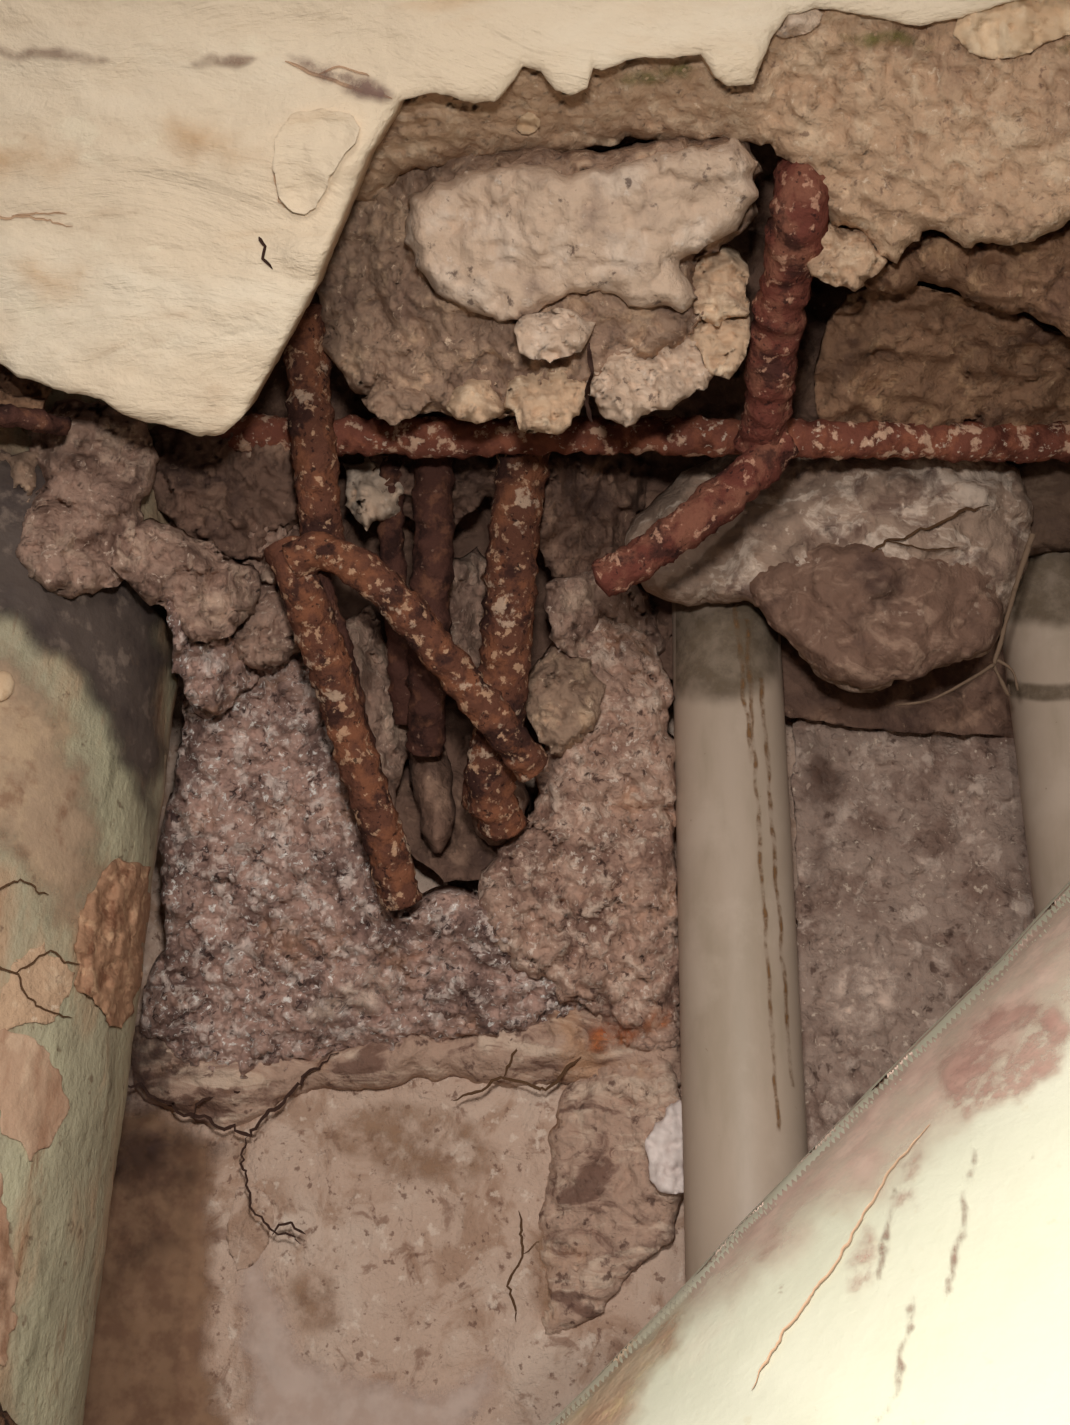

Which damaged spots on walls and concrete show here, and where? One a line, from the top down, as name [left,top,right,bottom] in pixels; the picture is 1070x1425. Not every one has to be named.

spalling [0,0,1070,799]
crack [0,878,49,895]
peeling [0,660,101,918]
spalling [131,414,1070,1335]
peeling [0,942,75,1161]
crack [0,950,78,1018]
crack [128,1052,339,1244]
crack [453,1048,581,1101]
peeling [0,1173,19,1366]
crack [506,1211,539,1321]
rust [556,1319,676,1425]